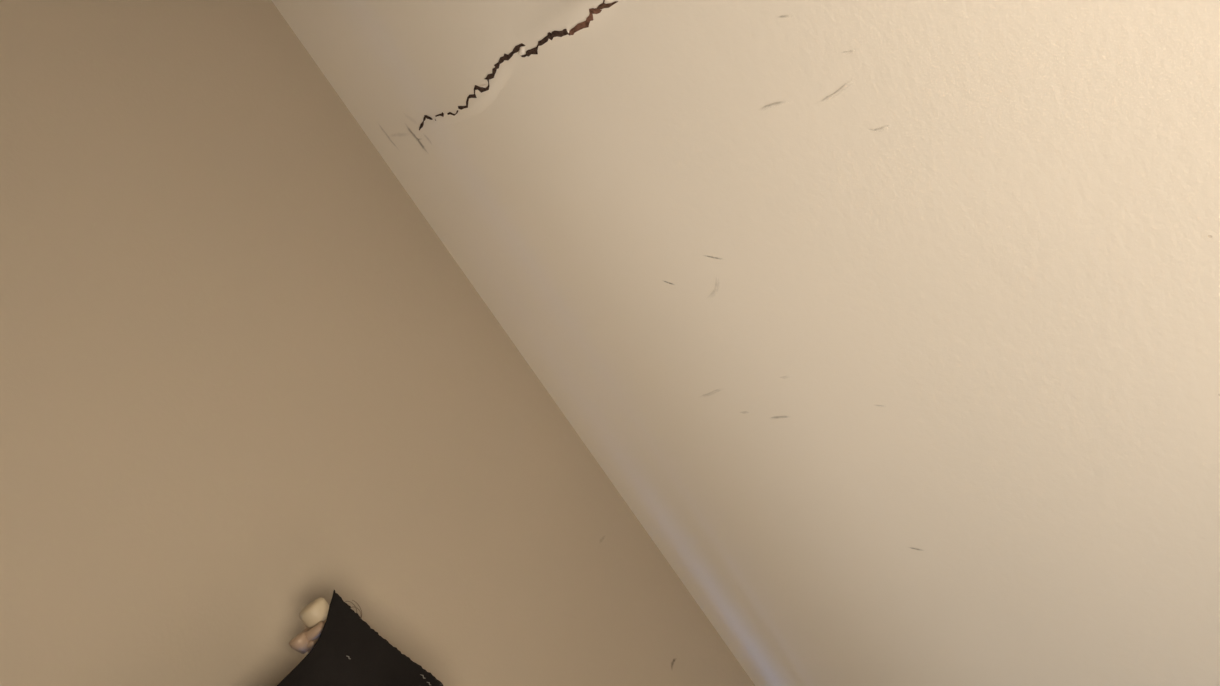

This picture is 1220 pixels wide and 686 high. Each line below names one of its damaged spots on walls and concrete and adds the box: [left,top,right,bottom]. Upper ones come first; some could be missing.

crack [419,0,618,130]